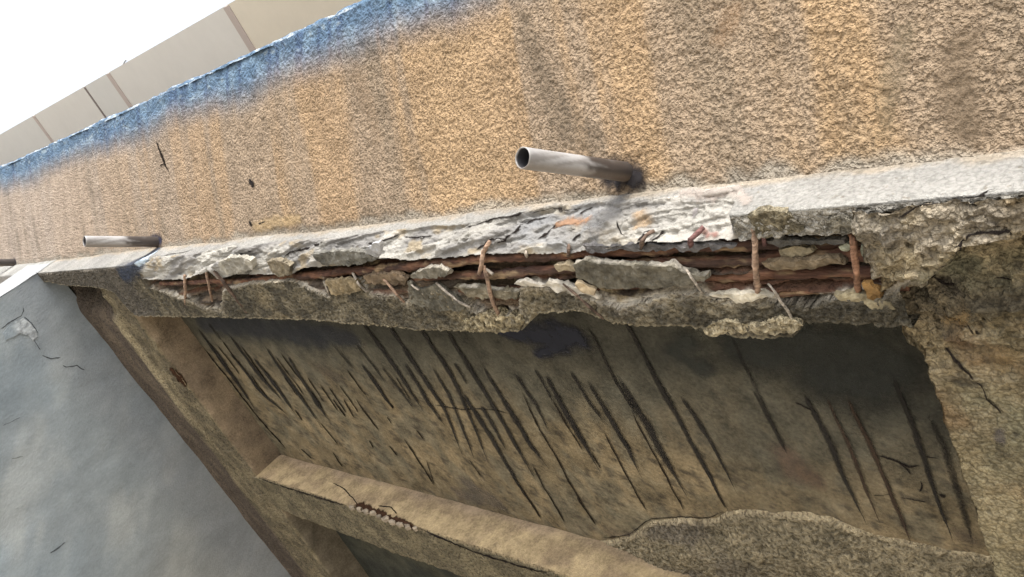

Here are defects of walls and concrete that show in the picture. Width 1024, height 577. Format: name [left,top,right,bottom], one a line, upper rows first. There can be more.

crack [156,142,168,170]
spalling [139,186,1024,388]
peeling [3,318,37,340]
crack [3,308,84,370]
crack [205,342,434,514]
damp [498,319,687,496]
crack [946,348,1001,413]
crack [436,395,725,538]
crack [874,456,945,502]